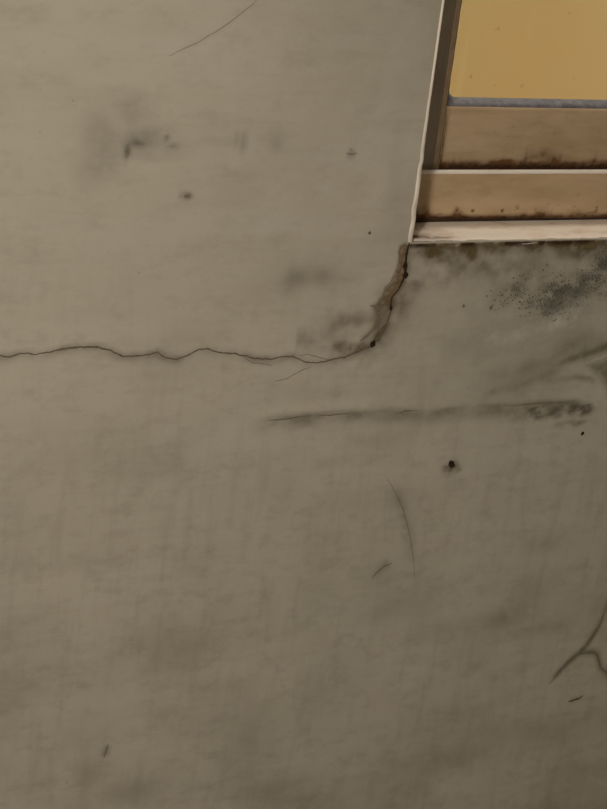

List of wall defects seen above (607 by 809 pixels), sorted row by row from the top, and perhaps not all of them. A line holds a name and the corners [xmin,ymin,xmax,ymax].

crack [0,243,410,381]
damp [461,243,477,261]
damp [482,240,607,347]
crack [550,608,607,683]